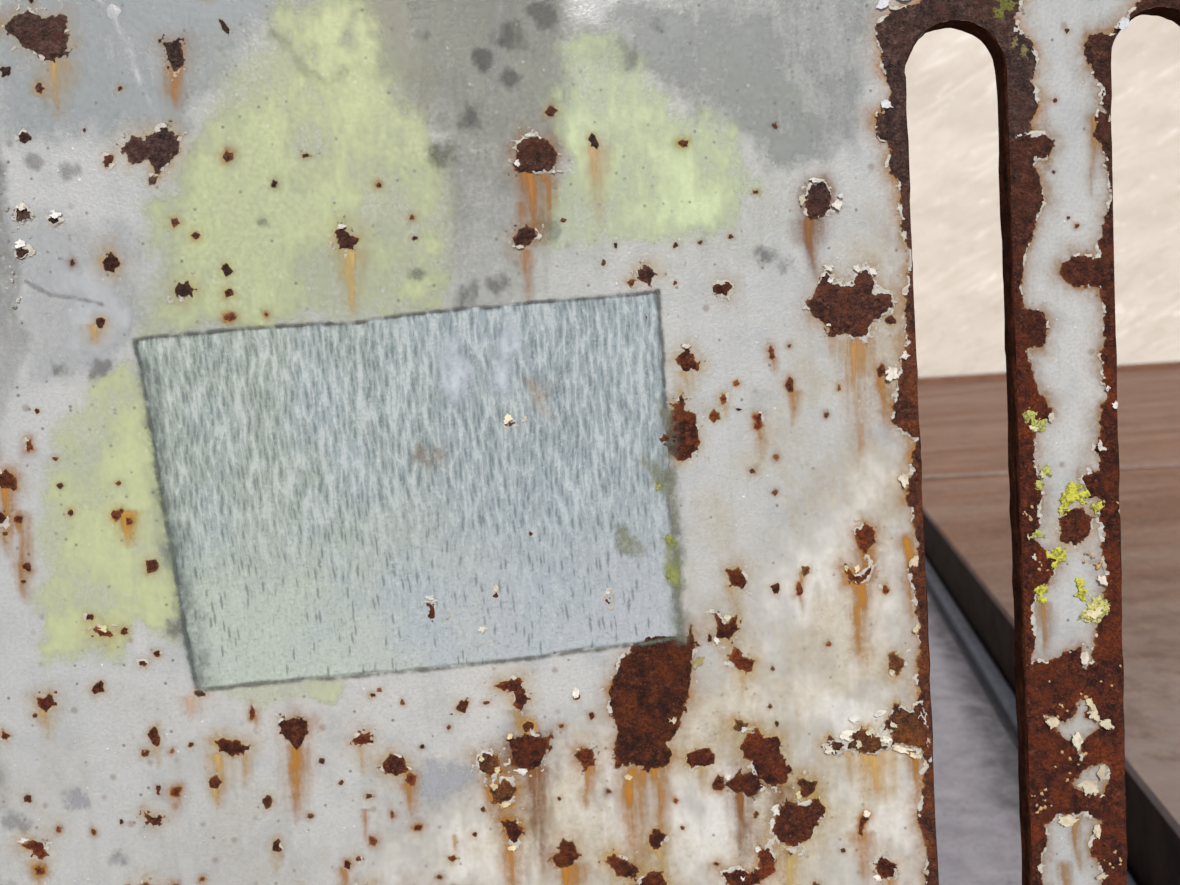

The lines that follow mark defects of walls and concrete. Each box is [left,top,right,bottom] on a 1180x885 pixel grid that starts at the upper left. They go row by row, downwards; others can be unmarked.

rust [2,4,72,95]
rust [100,120,188,185]
rust [508,127,563,271]
rust [799,0,1180,885]
rust [706,600,756,679]
rust [274,713,309,801]
rust [449,698,469,715]
rust [470,672,583,885]
rust [574,624,836,885]
peeling [820,701,932,791]